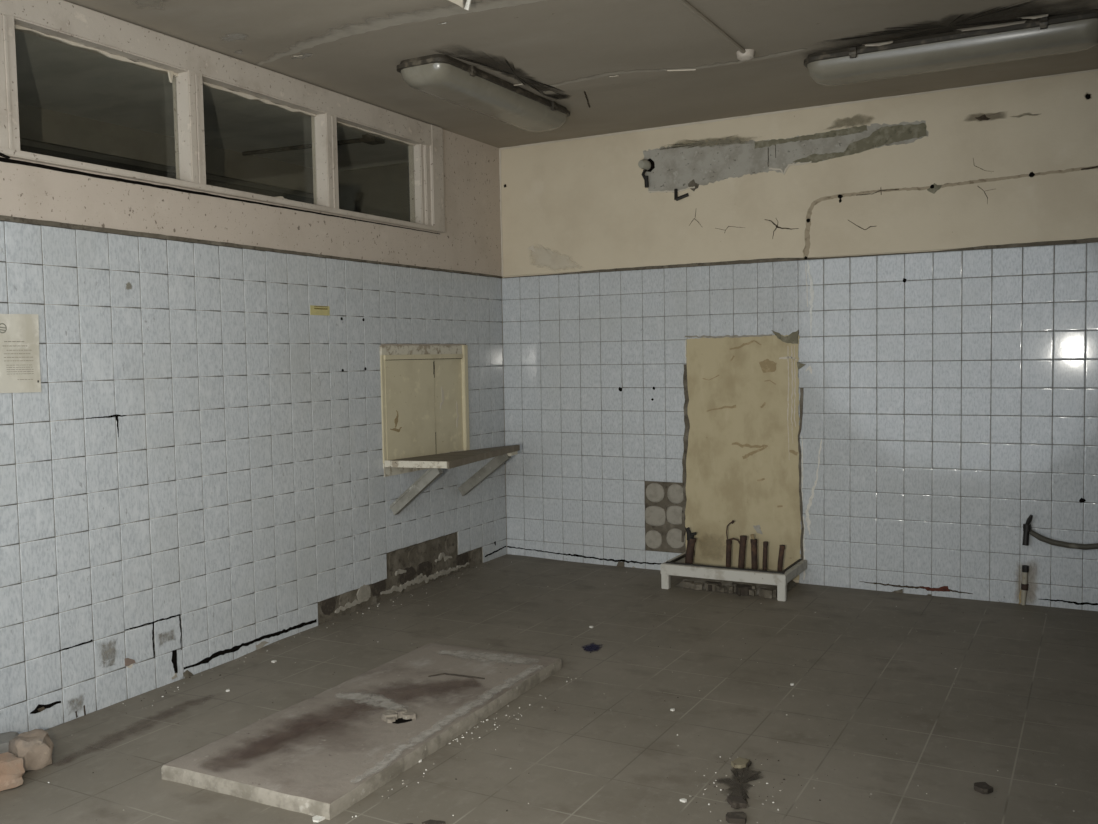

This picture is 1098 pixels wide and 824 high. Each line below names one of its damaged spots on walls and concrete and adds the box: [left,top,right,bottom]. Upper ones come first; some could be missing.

flaking render [643,116,929,193]
crack [690,213,799,239]
crack [86,414,127,437]
peeling [318,532,482,625]
crack [860,581,972,596]
crack [125,614,317,680]